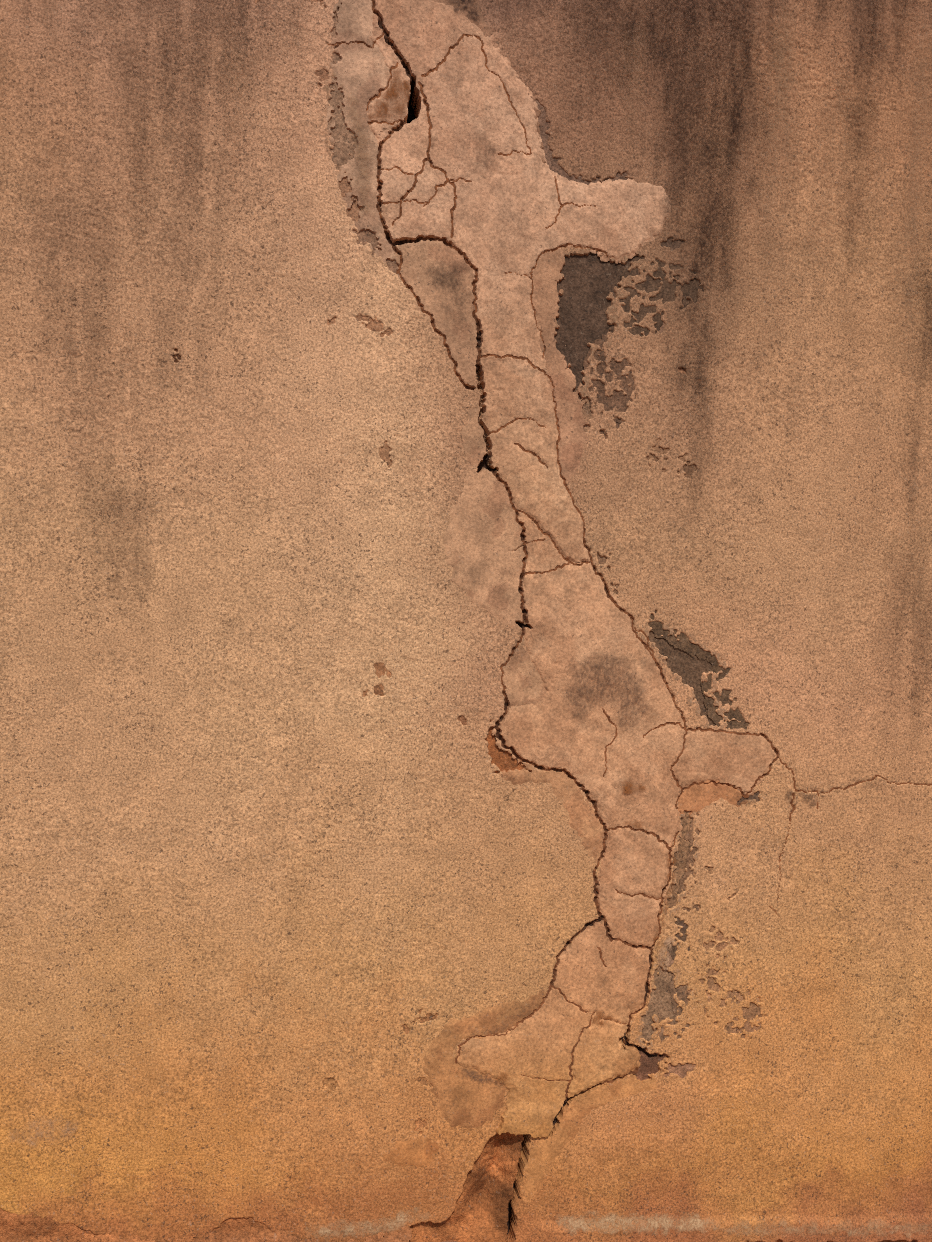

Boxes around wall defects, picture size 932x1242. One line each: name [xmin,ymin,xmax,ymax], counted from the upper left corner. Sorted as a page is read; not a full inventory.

flaking render [311,0,398,273]
flaking render [535,99,633,185]
flaking render [356,314,393,337]
flaking render [554,237,704,439]
flaking render [646,439,697,478]
crack [326,0,932,1151]
flaking render [363,663,391,697]
flaking render [647,610,749,730]
flaking render [485,727,530,773]
flaking render [737,791,760,806]
flaking render [635,810,766,1081]
crack [507,1183,515,1235]